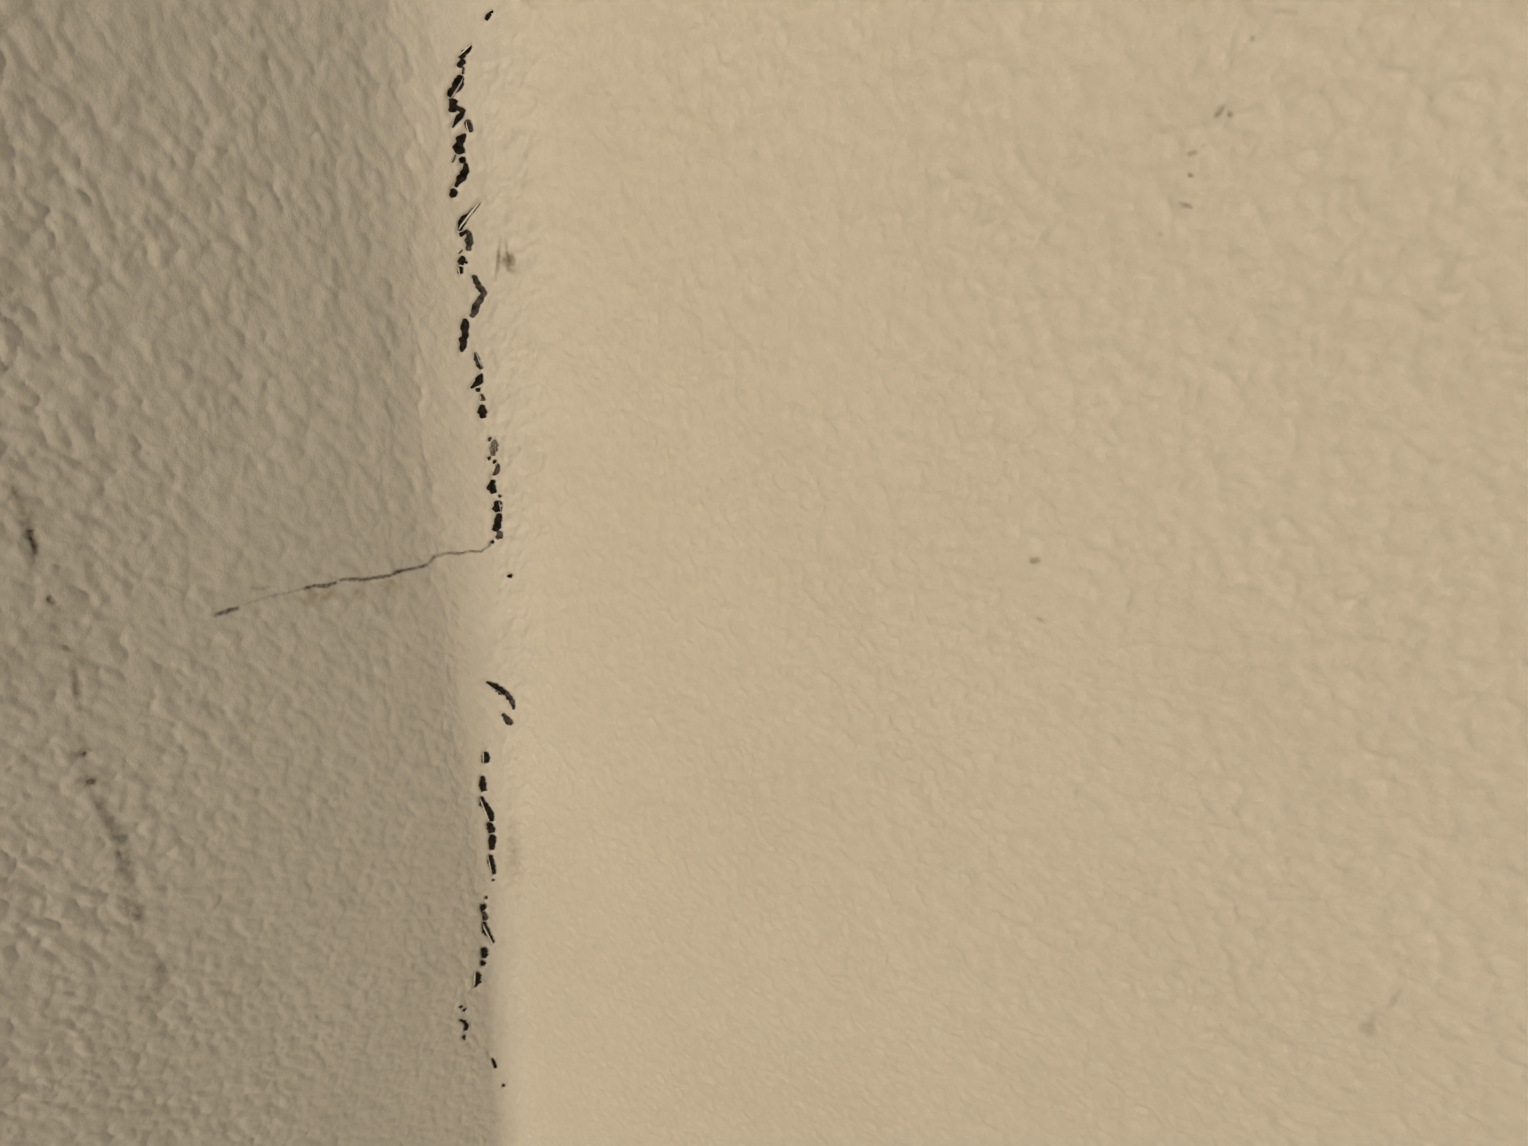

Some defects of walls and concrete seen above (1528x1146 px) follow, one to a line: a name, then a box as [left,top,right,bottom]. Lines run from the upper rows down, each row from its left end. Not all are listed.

crack [306,44,503,588]
crack [459,681,515,1087]